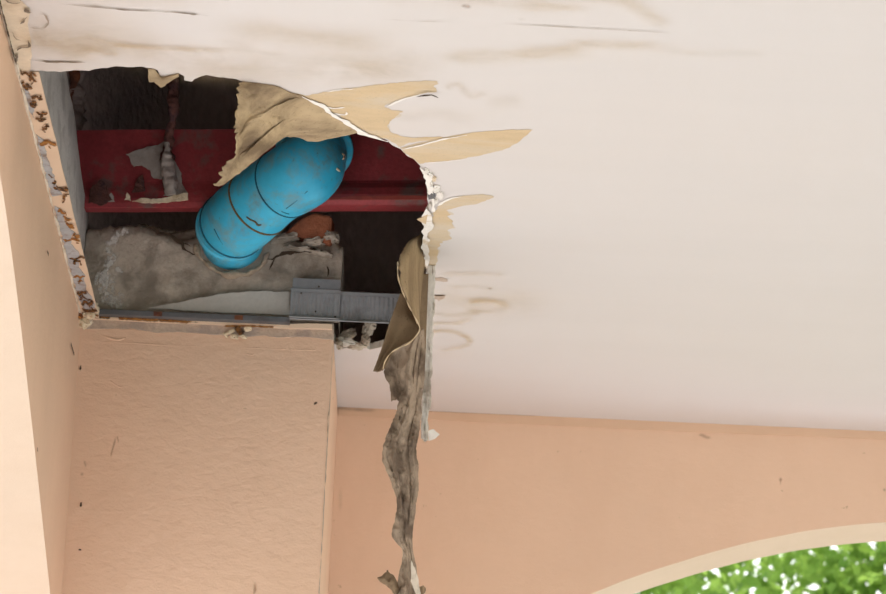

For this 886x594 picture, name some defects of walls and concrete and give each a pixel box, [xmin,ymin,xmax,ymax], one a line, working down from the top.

corrosion [20,70,56,149]
peeling [126,141,165,179]
peeling [295,81,532,269]
peeling [36,134,95,309]
spalling [334,322,377,351]